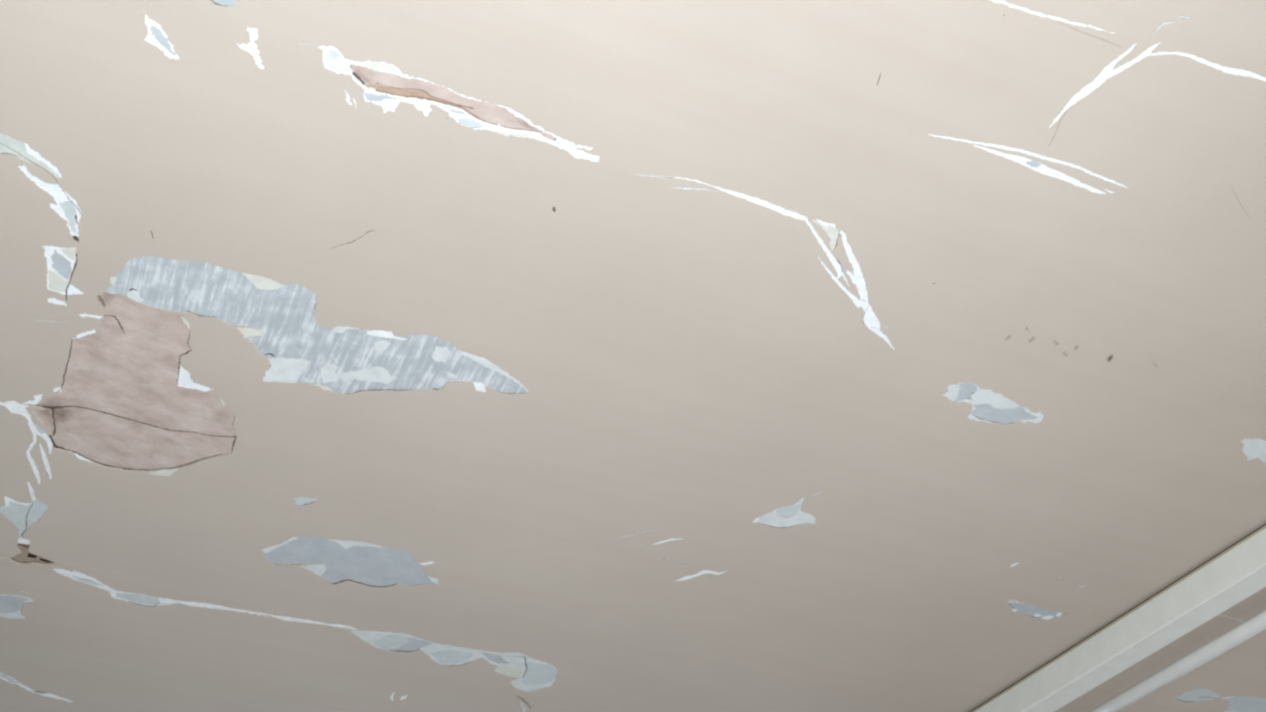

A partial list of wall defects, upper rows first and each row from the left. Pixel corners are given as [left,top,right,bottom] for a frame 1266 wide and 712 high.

peeling [144,14,179,60]
flaking render [318,46,600,162]
crack [928,0,1266,195]
crack [639,175,895,350]
flaking render [0,134,529,476]
peeling [943,382,1043,424]
peeling [1240,438,1266,464]
peeling [753,493,818,528]
peeling [262,536,439,587]
peeling [351,630,558,692]
crack [0,672,73,703]
peeling [1173,688,1266,712]